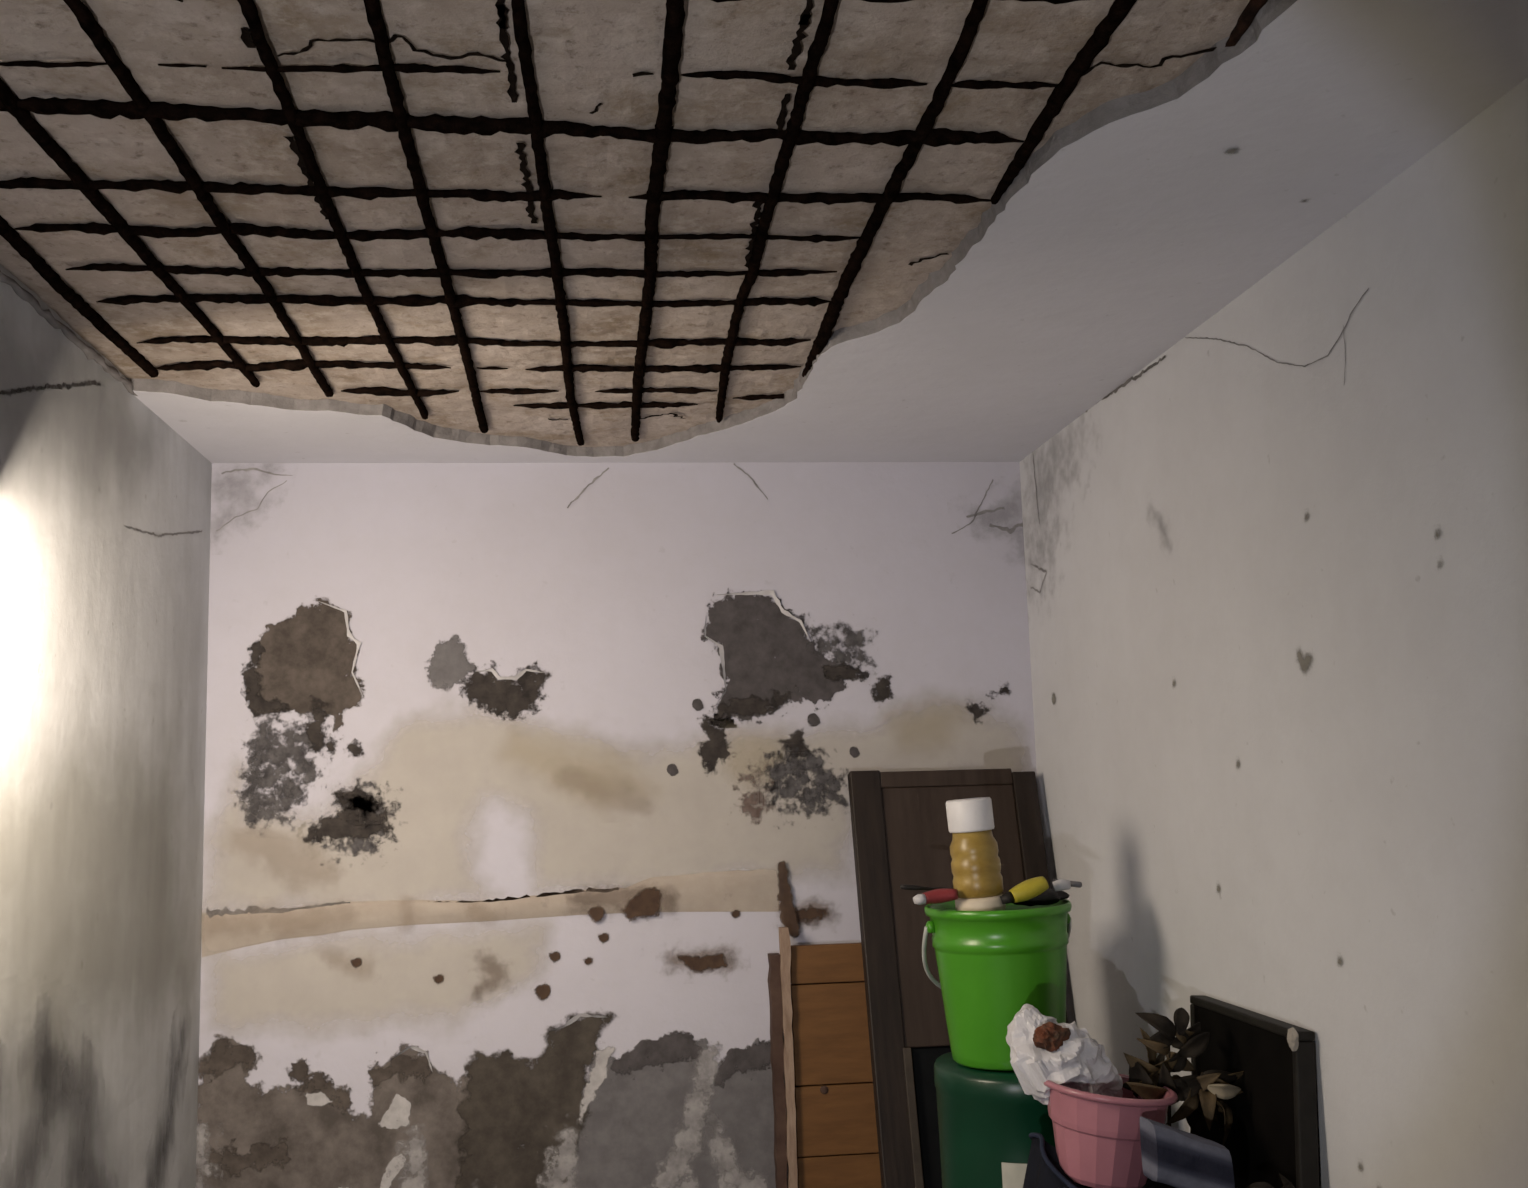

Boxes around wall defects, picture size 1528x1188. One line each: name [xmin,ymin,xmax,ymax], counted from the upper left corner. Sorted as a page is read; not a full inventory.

spalling [0,0,1297,457]
crack [0,380,101,396]
crack [1086,288,1369,412]
crack [1031,564,1047,593]
peeling [235,598,365,828]
peeling [425,635,550,720]
damp [214,708,1022,908]
peeling [667,764,678,776]
peeling [692,590,893,829]
peeling [967,687,1010,723]
damp [218,929,541,1024]
peeling [196,1012,788,1188]